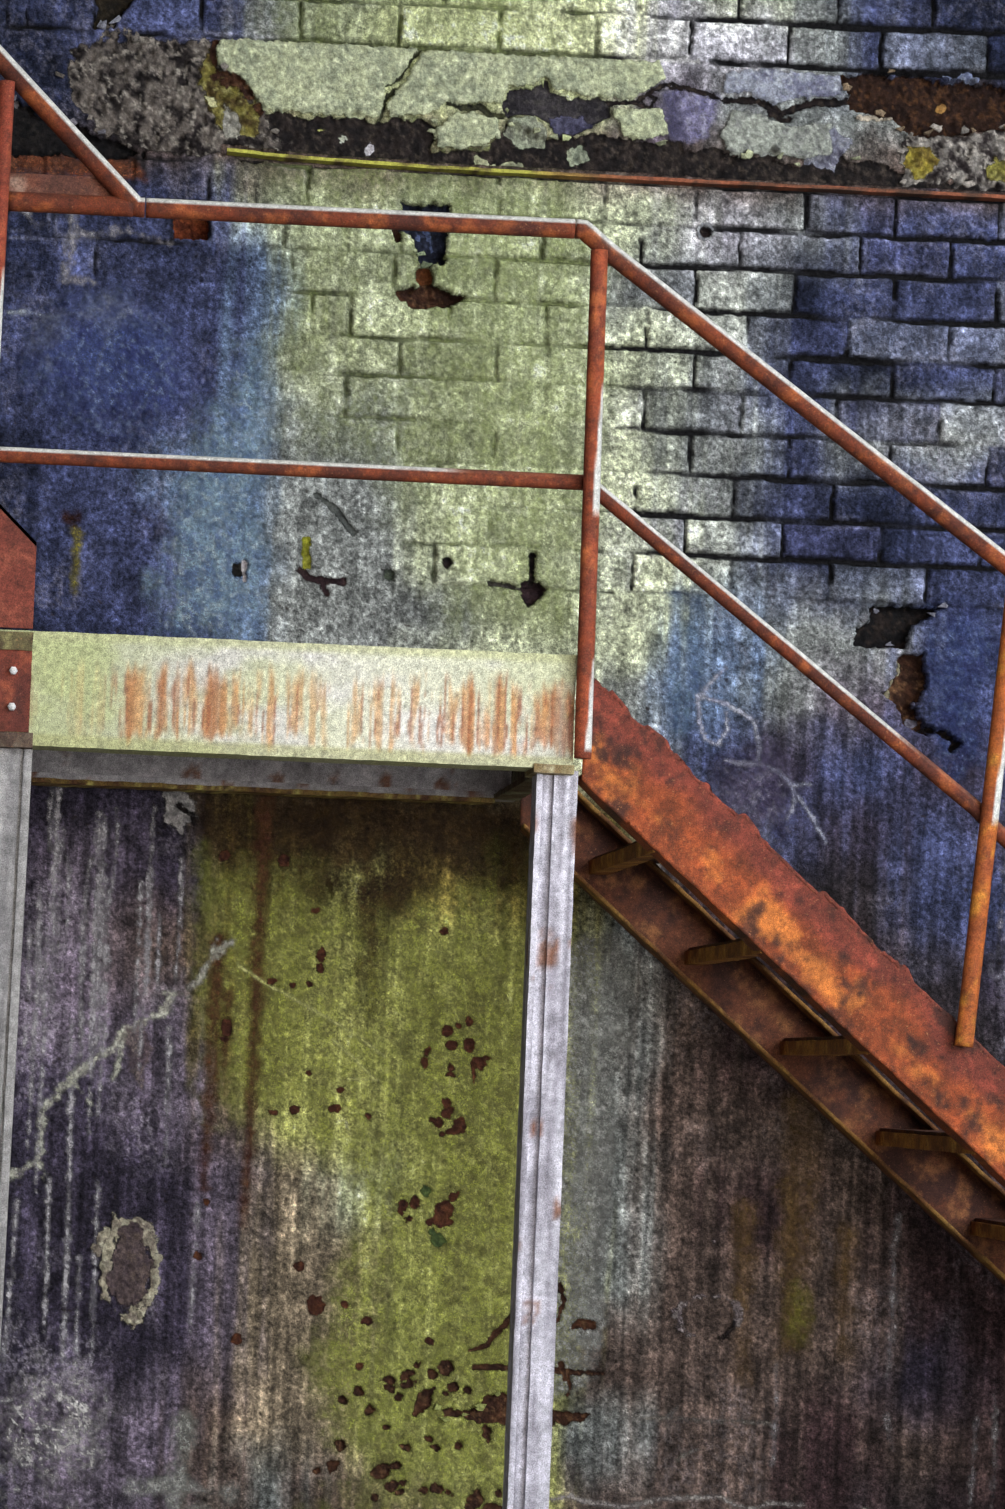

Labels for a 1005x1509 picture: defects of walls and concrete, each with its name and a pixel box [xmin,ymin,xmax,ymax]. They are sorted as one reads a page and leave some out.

spalling [11,95,77,159]
crack [377,49,421,122]
crack [446,102,505,119]
peeling [55,0,1005,192]
crack [605,81,848,123]
spalling [392,230,464,310]
spalling [853,603,961,753]
water stain [71,813,119,1069]
water stain [198,793,528,1095]
water stain [23,789,99,1360]
water stain [414,957,525,1364]
peeling [90,1212,163,1329]